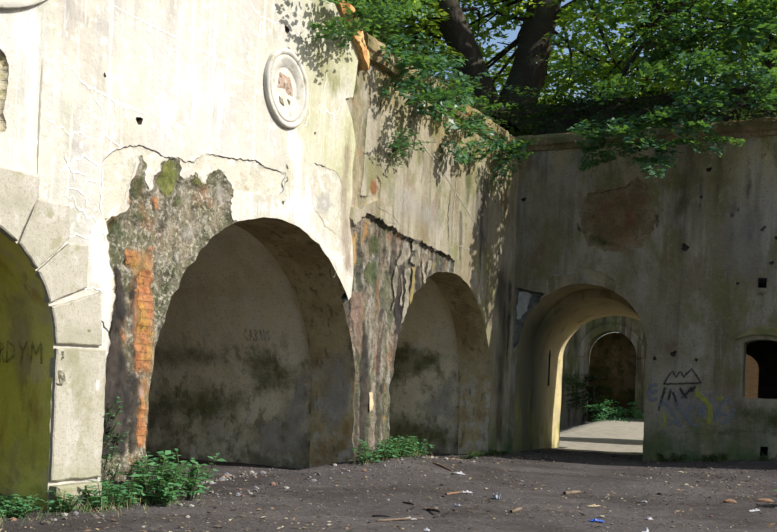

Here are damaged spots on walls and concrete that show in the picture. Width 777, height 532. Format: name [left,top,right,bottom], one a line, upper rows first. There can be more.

spalling [0,49,8,133]
crack [47,63,149,262]
spalling [100,145,285,502]
spalling [310,65,454,459]
spalling [513,268,616,348]